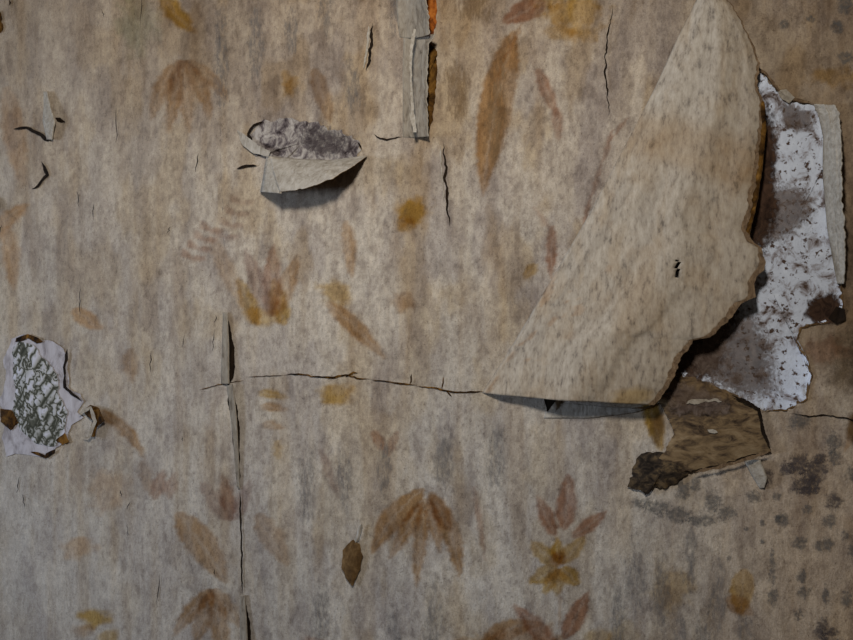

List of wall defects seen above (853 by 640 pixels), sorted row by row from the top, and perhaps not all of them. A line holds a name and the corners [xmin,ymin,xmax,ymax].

crack [0,0,11,33]
peeling [482,0,846,419]
peeling [0,334,105,459]
crack [200,371,483,397]
crack [791,413,853,422]
peeling [744,459,767,488]
leakage [780,436,839,495]